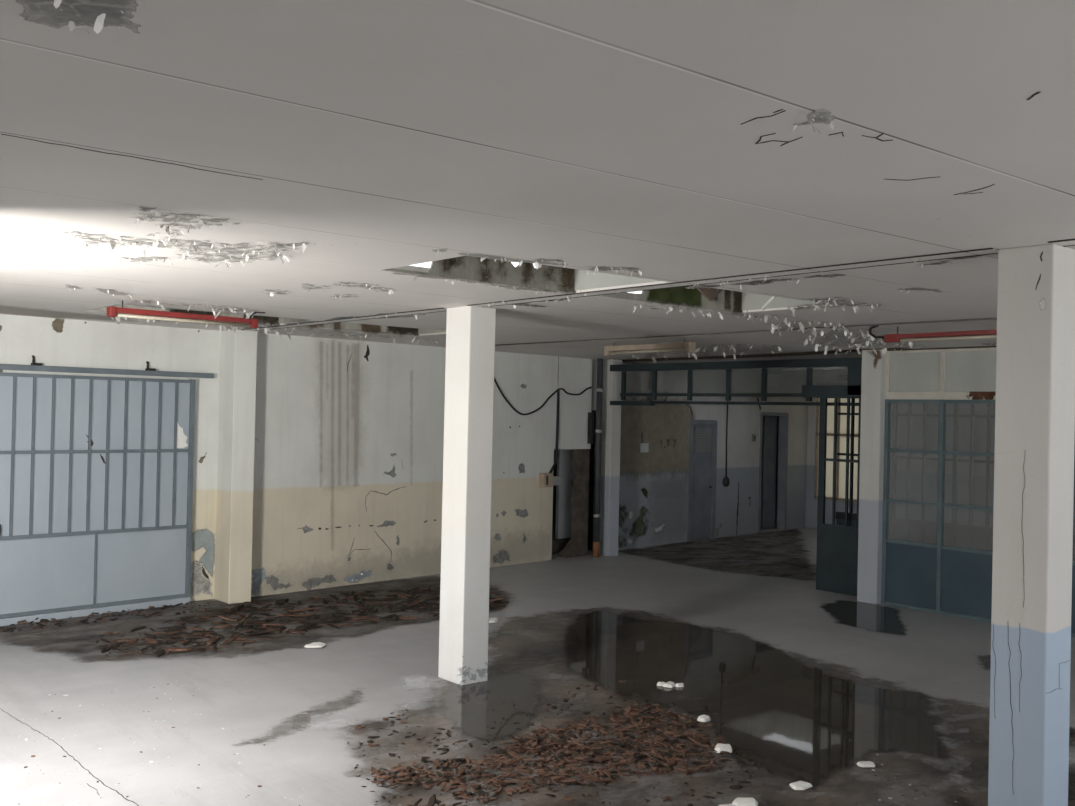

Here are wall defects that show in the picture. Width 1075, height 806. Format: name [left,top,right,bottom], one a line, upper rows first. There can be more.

peeling [16,0,140,35]
peeling [63,207,316,268]
peeling [621,296,926,363]
peeling [251,567,371,595]